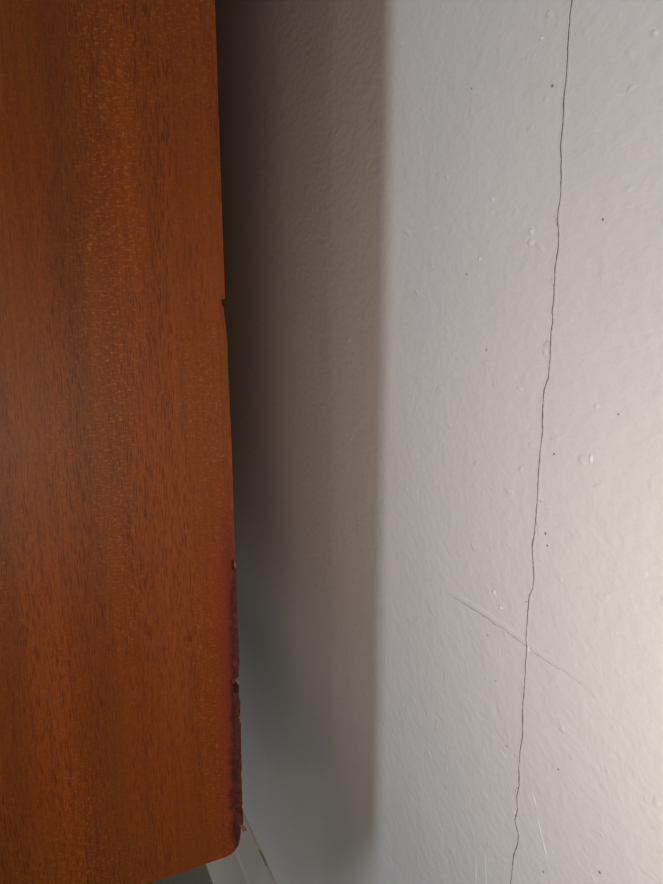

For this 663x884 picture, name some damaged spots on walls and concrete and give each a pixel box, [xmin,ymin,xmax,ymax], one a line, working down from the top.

crack [509,0,575,884]